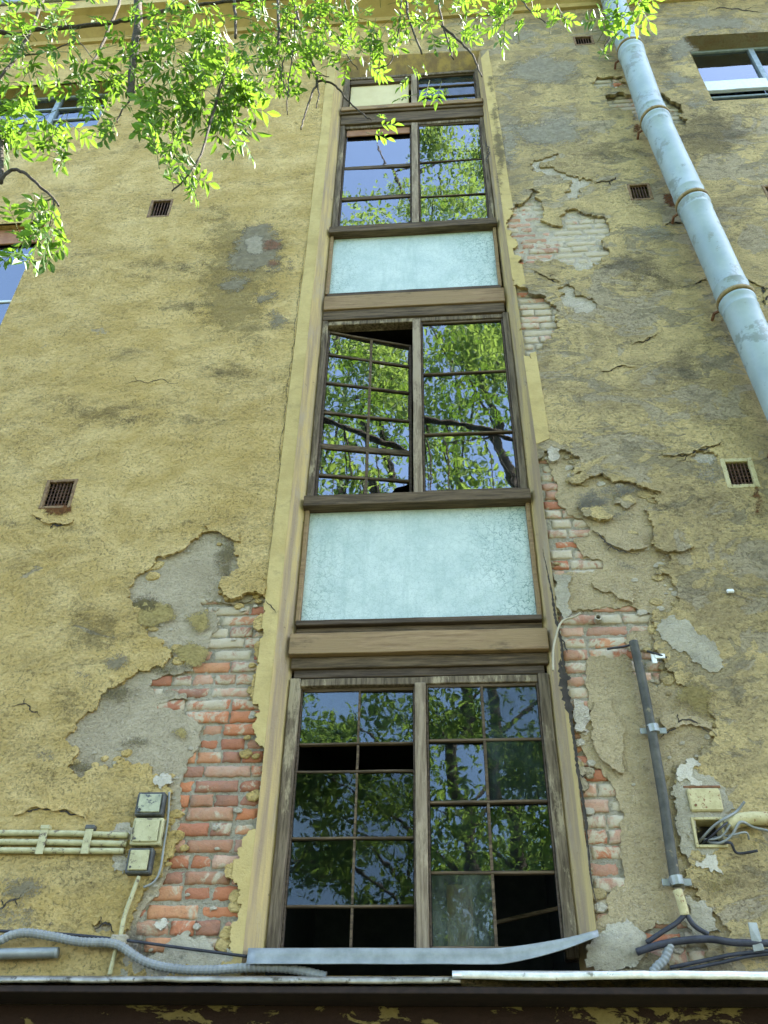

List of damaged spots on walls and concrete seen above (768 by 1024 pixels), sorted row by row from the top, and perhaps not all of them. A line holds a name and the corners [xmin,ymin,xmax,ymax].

spalling [507,155,610,271]
peeling [219,223,293,329]
spalling [515,285,598,357]
crack [662,437,721,461]
corrosion [44,504,72,515]
spalling [65,523,267,957]
spalling [538,446,731,971]
crack [14,798,89,819]